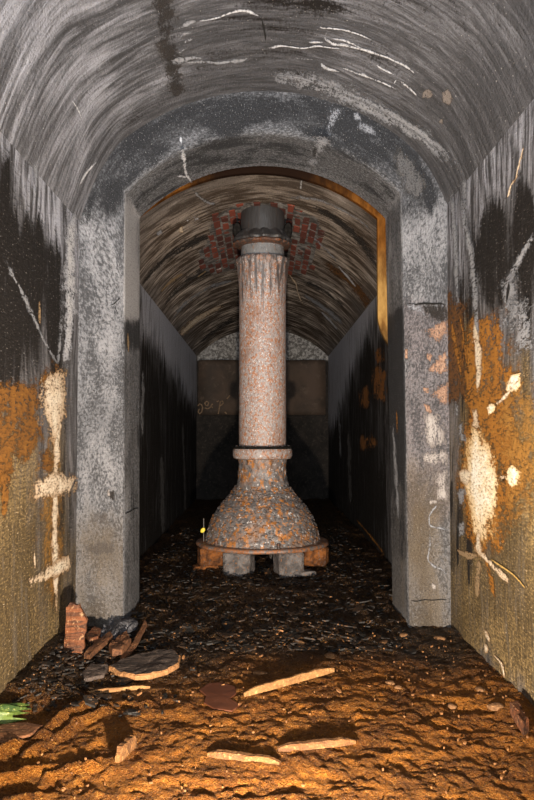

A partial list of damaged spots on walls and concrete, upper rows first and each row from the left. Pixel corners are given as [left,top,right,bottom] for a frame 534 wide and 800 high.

damp [152,0,258,97]
crack [262,20,340,49]
crack [178,137,215,205]
flaking render [198,202,325,276]
damp [499,236,534,356]
rust [0,363,64,603]
damp [9,209,80,613]
efflorescence [454,373,525,597]
rust [447,288,534,597]